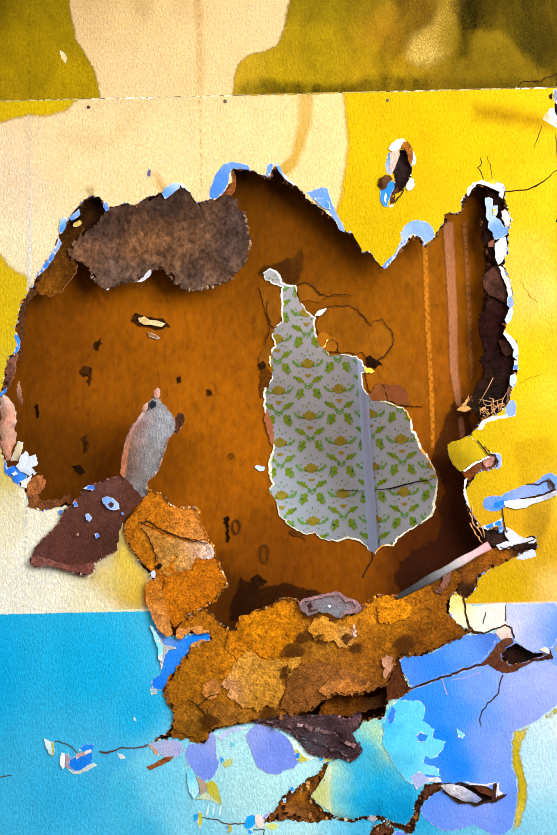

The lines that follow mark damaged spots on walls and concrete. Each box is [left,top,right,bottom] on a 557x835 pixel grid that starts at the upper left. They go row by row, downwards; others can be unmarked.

spalling [515,87,557,154]
spalling [378,139,416,208]
spalling [0,162,519,513]
spalling [31,555,94,576]
peeling [122,487,229,695]
peeling [299,591,362,618]
peeling [352,459,557,835]
peeling [44,722,338,835]
crack [330,782,445,835]